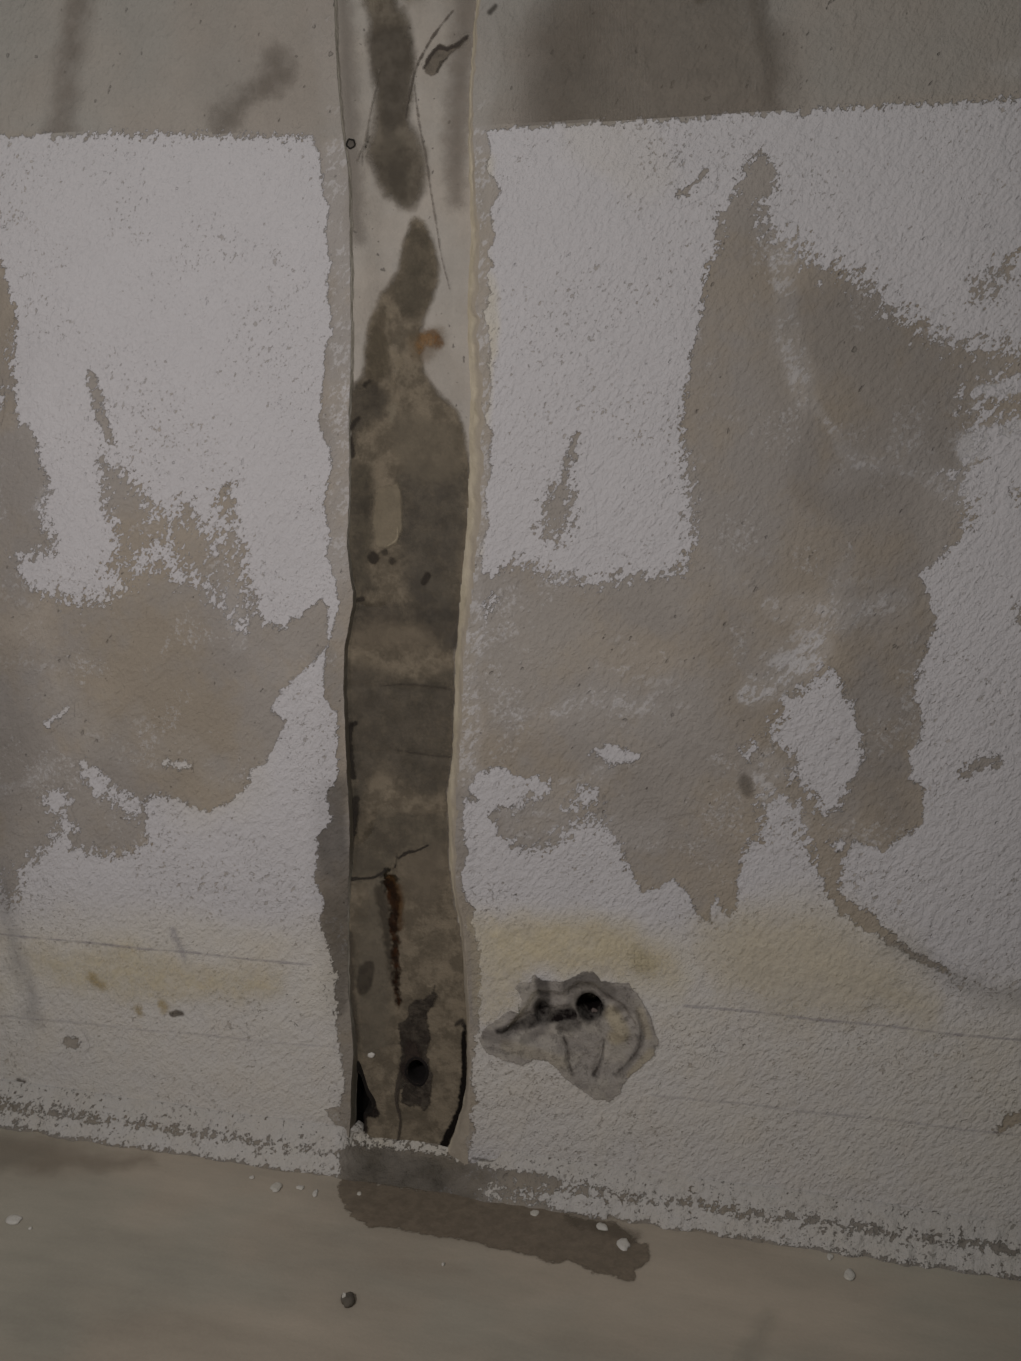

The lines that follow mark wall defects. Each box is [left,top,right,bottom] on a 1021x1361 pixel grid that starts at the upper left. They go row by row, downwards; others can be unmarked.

flaking render [0,0,658,1165]
leakage [347,0,469,1144]
peeling [465,139,1021,991]
corrosion [377,877,402,1006]
crack [395,1071,409,1141]
crack [440,1020,493,1162]
peeling [983,1099,1021,1144]